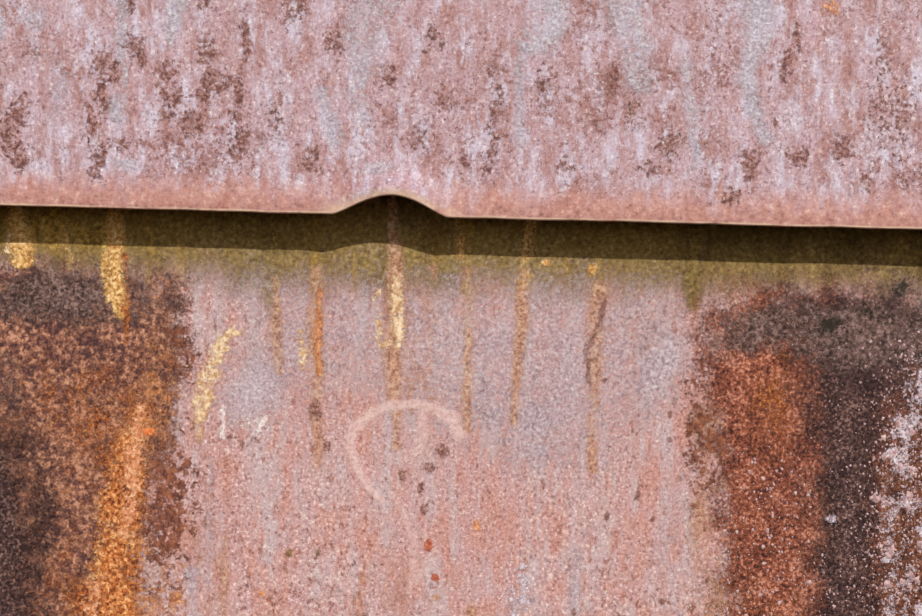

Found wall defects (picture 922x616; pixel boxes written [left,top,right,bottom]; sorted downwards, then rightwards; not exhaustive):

rust [0,91,32,174]
rust [81,43,129,181]
rust [116,0,254,174]
rust [460,65,504,174]
leakage [4,206,35,269]
leakage [100,209,130,345]
rust [372,195,435,450]
leakage [683,224,704,310]
rust [0,251,243,616]
rust [681,273,865,616]
leakage [704,278,922,616]
rust [857,362,922,616]